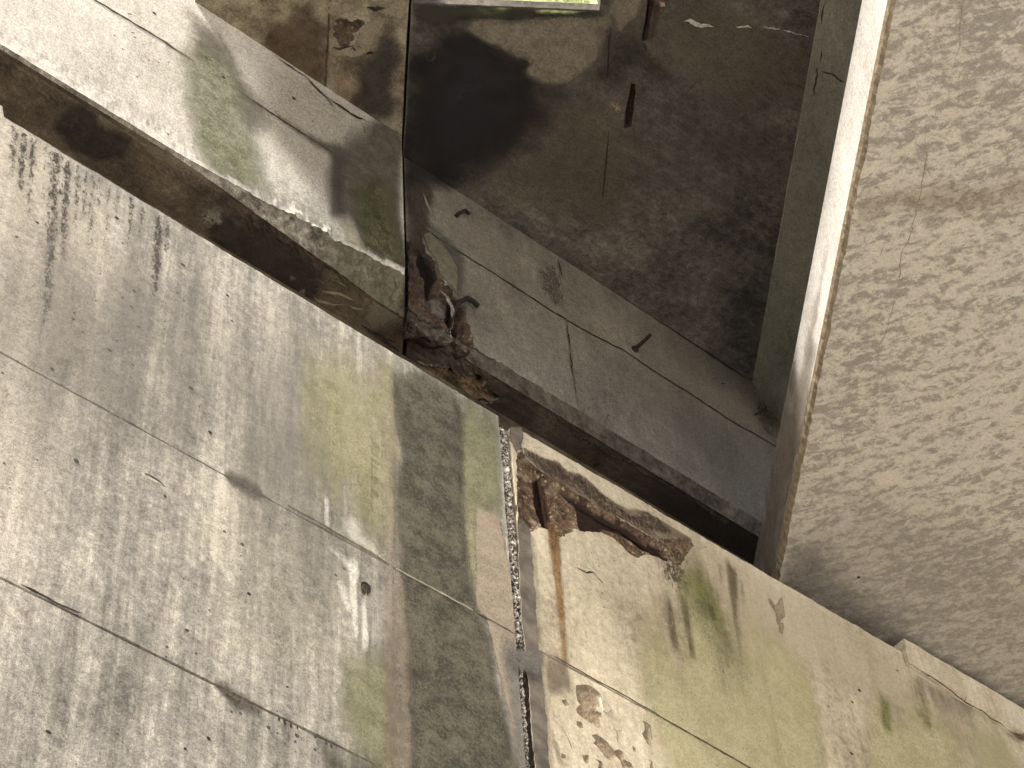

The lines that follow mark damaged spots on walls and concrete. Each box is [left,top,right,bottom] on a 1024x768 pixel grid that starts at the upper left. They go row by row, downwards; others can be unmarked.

peeling [327,0,408,58]
damp [9,105,192,338]
spalling [402,232,480,359]
crack [555,258,579,409]
spalling [555,415,669,485]
spalling [515,448,694,567]
rust [548,526,567,661]
damp [661,552,685,591]
damp [668,601,693,652]
damp [728,564,743,666]
peeling [562,685,635,768]
peeling [642,721,651,746]